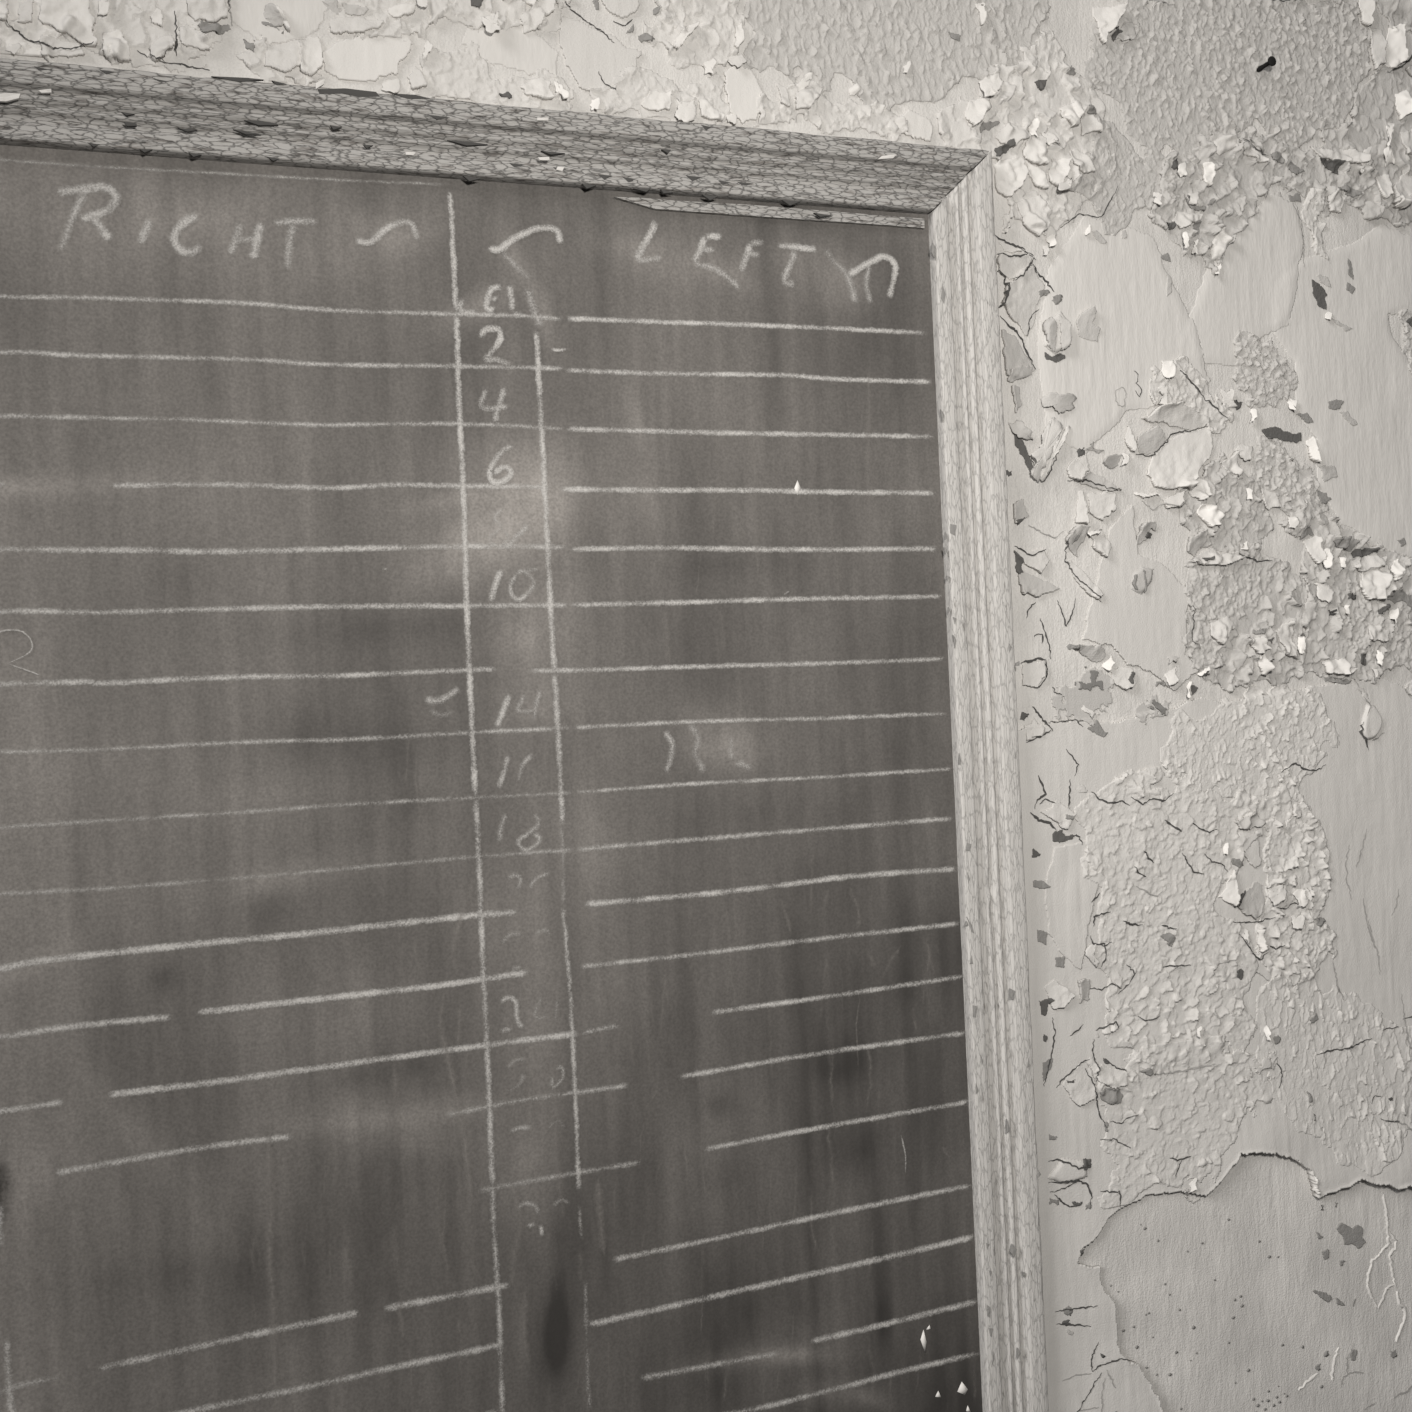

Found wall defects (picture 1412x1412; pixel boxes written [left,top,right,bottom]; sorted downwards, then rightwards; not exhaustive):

peeling [0,0,228,73]
peeling [0,93,21,103]
peeling [1398,309,1412,379]
peeling [1007,331,1412,1412]